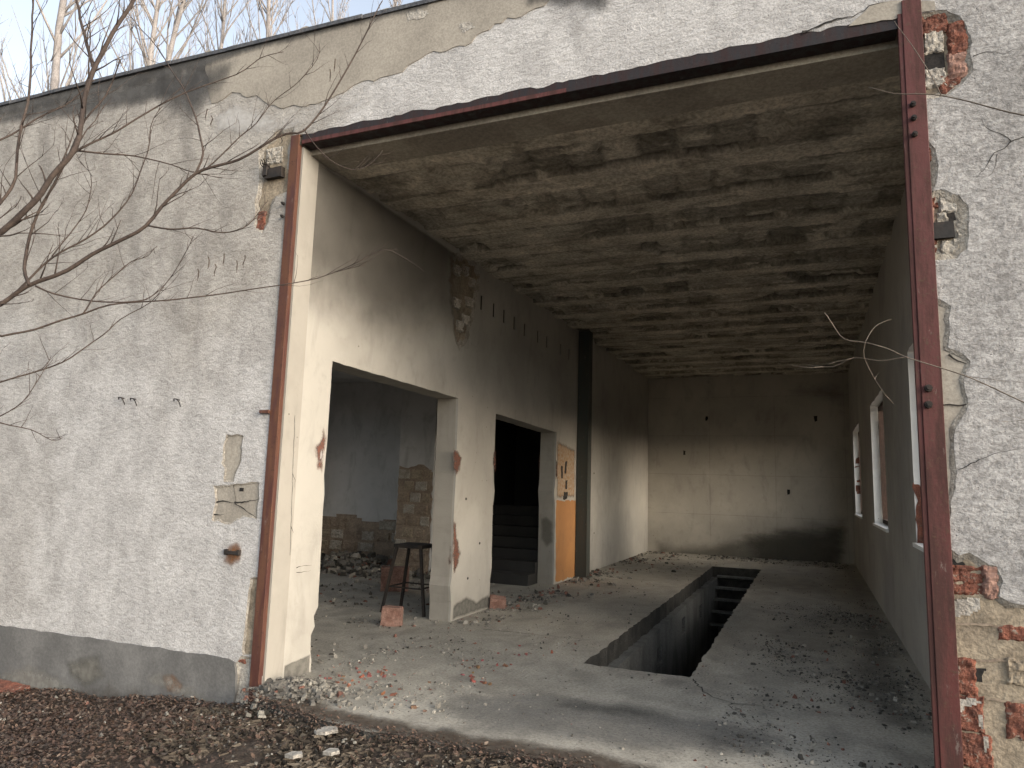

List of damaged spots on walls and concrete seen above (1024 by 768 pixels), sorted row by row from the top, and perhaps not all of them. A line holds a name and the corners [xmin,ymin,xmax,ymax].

peeling [205,0,549,109]
peeling [802,0,902,33]
flaking render [921,1,974,99]
flaking render [254,127,295,233]
flaking render [929,142,969,260]
crack [978,118,1024,176]
peeling [212,434,259,524]
flaking render [317,434,326,468]
peeling [556,443,574,500]
peeling [938,299,971,516]
rust [226,544,240,564]
flaking render [952,550,1024,768]